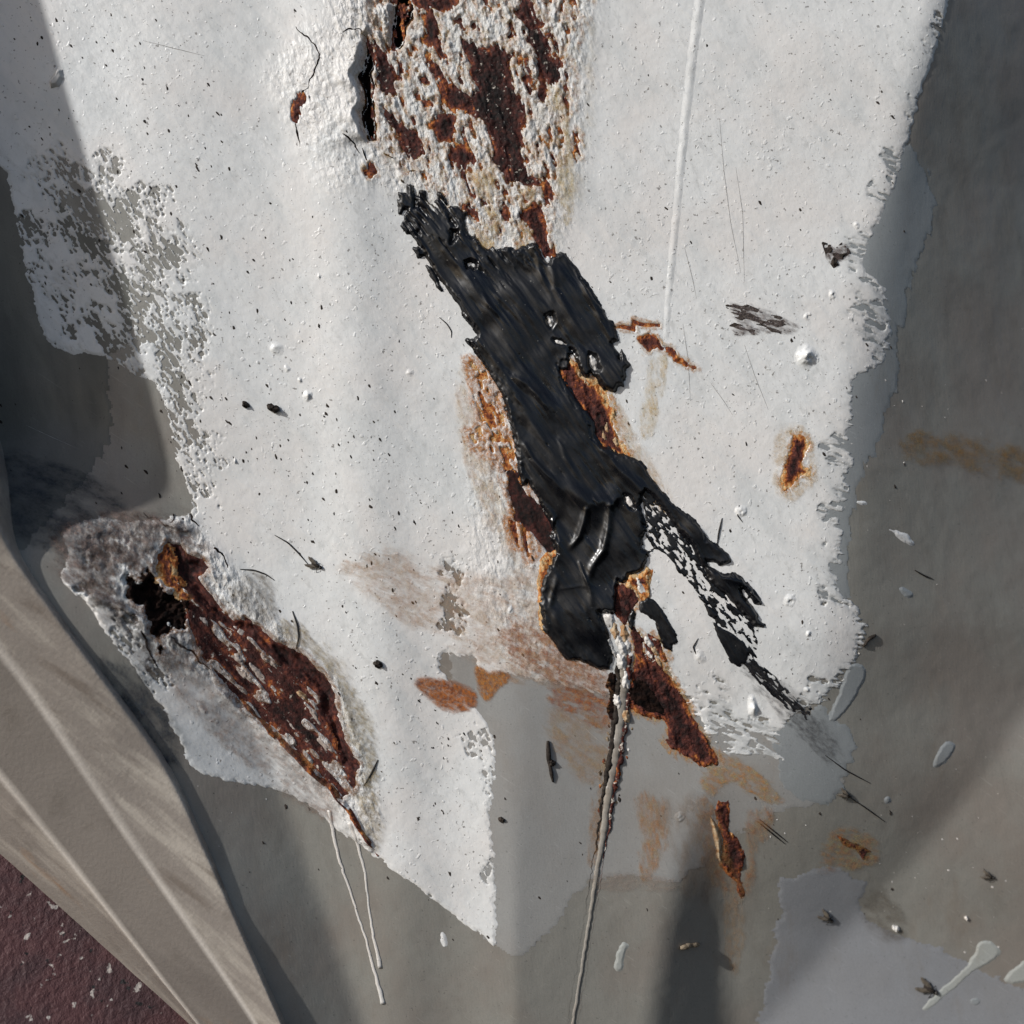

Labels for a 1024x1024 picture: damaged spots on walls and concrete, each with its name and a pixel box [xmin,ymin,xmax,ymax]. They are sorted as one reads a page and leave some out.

corrosion [291,27,320,144]
corrosion [341,0,581,258]
peeling [822,242,851,268]
corrosion [561,359,633,456]
corrosion [779,430,814,492]
corrosion [462,355,611,728]
corrosion [166,542,360,772]
corrosion [415,666,509,712]
peeling [613,640,630,723]
corrosion [603,566,779,802]
corrosion [239,698,379,857]